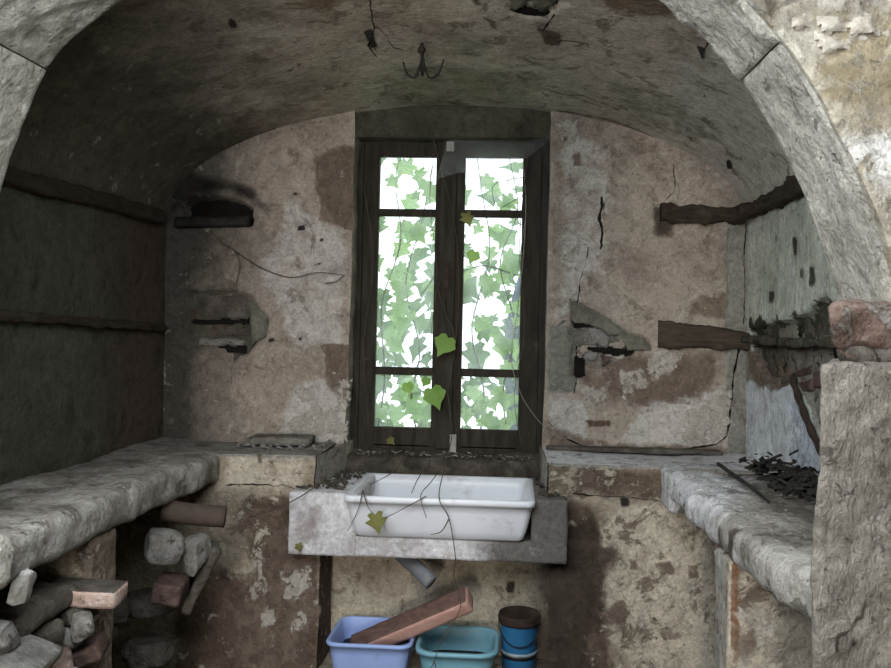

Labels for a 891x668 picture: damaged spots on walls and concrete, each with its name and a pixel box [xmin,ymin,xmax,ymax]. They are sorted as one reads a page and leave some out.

crack [367,0,402,58]
spalling [510,0,558,16]
peeling [538,29,561,46]
spalling [190,292,274,361]
spalling [557,301,683,410]
crack [690,225,761,449]
spalling [748,298,838,426]
peeling [679,390,733,446]